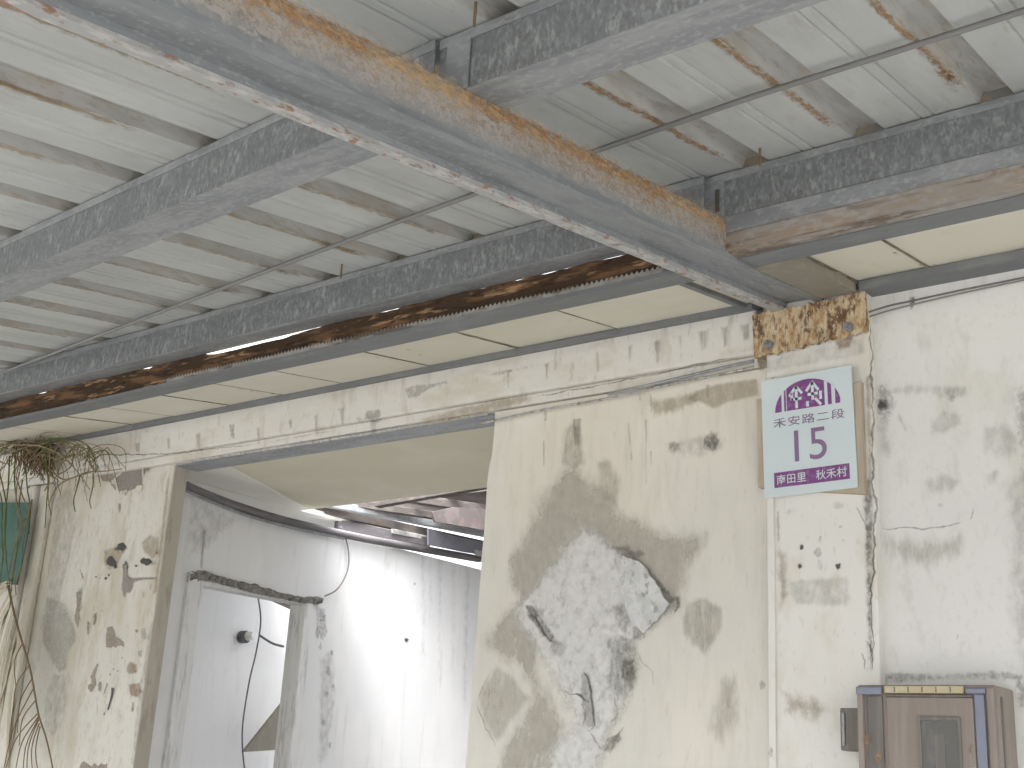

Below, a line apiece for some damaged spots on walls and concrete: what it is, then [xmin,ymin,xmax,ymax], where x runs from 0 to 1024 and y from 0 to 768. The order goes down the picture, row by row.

corrosion [181,0,1024,258]
peeling [122,565,154,597]
spalling [187,570,323,605]
crack [865,328,878,668]